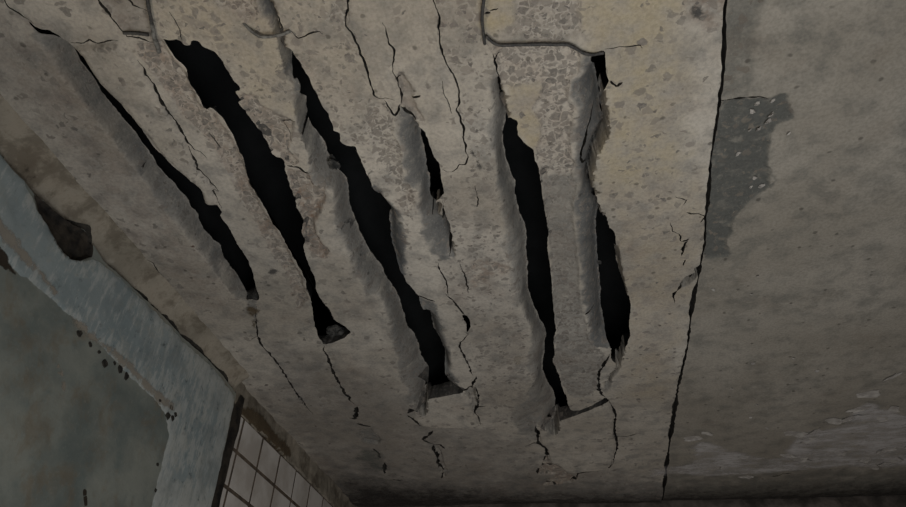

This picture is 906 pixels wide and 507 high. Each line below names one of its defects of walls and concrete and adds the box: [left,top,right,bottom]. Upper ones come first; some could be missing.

crack [345,0,421,120]
crack [433,0,469,172]
crack [719,94,768,102]
peeling [0,156,234,507]
spalling [29,0,480,429]
crack [252,307,313,414]
crack [323,348,371,427]
crack [408,416,444,478]
crack [417,191,484,424]
spalling [486,0,631,484]
crack [529,354,635,485]
crack [670,197,706,303]